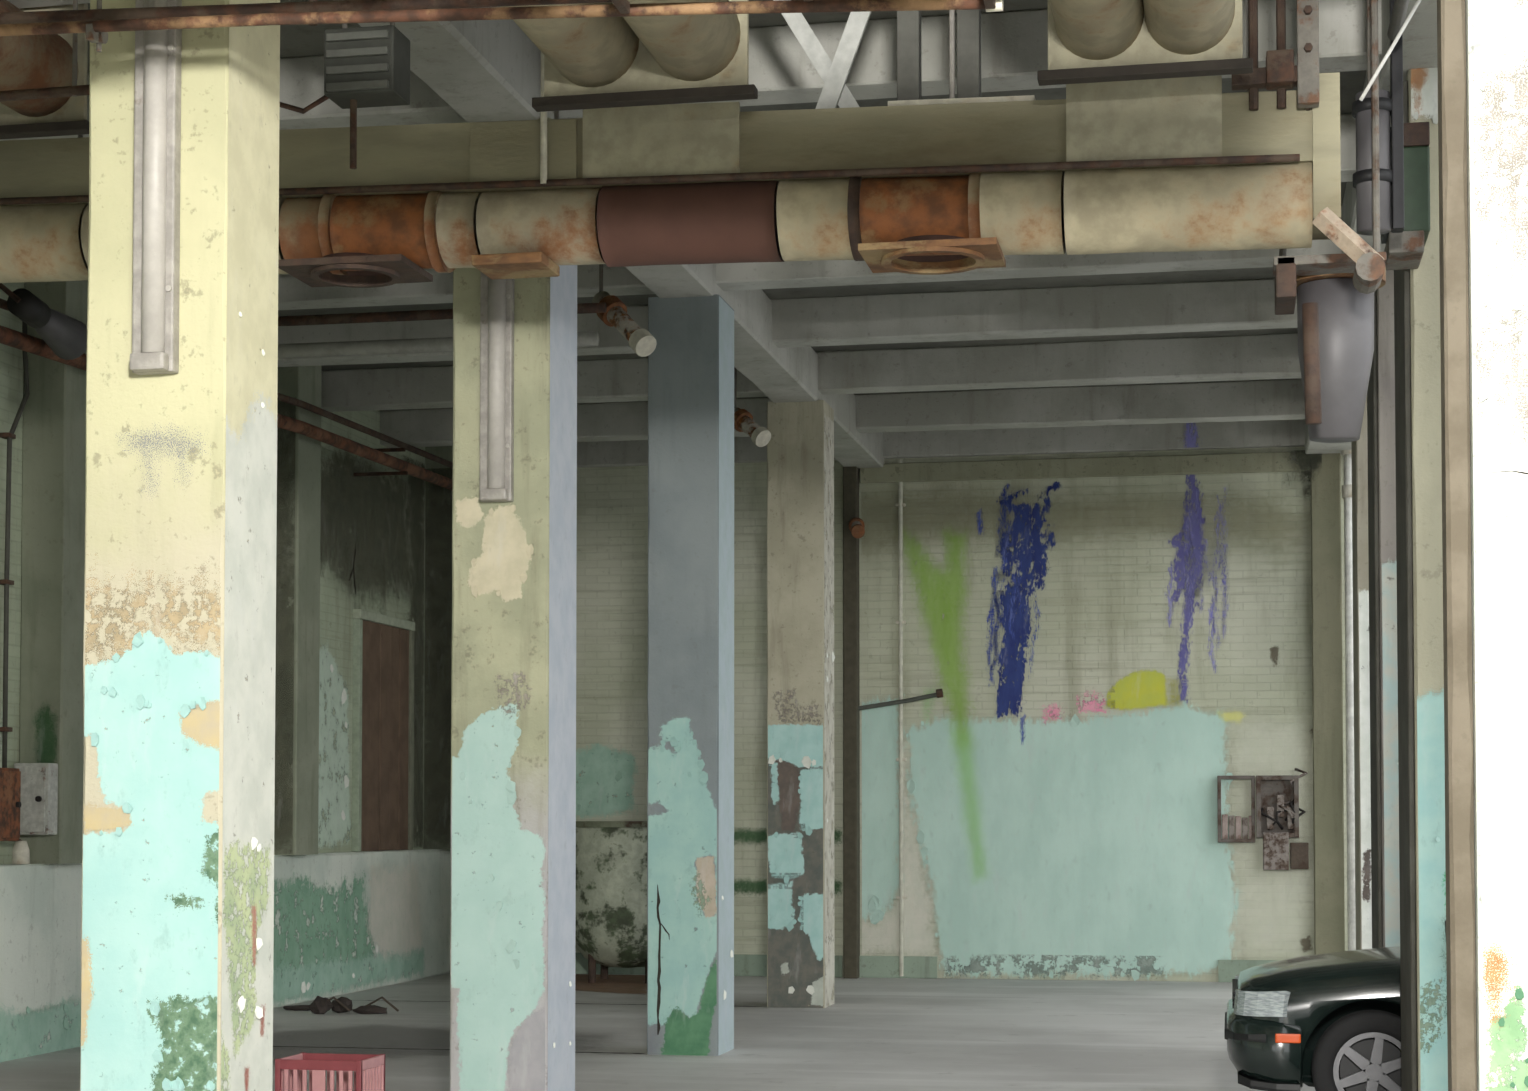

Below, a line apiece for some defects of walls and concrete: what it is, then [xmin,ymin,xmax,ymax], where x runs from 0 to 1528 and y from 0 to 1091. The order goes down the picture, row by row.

peeling [0,25,425,1091]
peeling [451,265,734,1091]
spalling [768,414,835,1008]
peeling [1473,20,1528,1091]